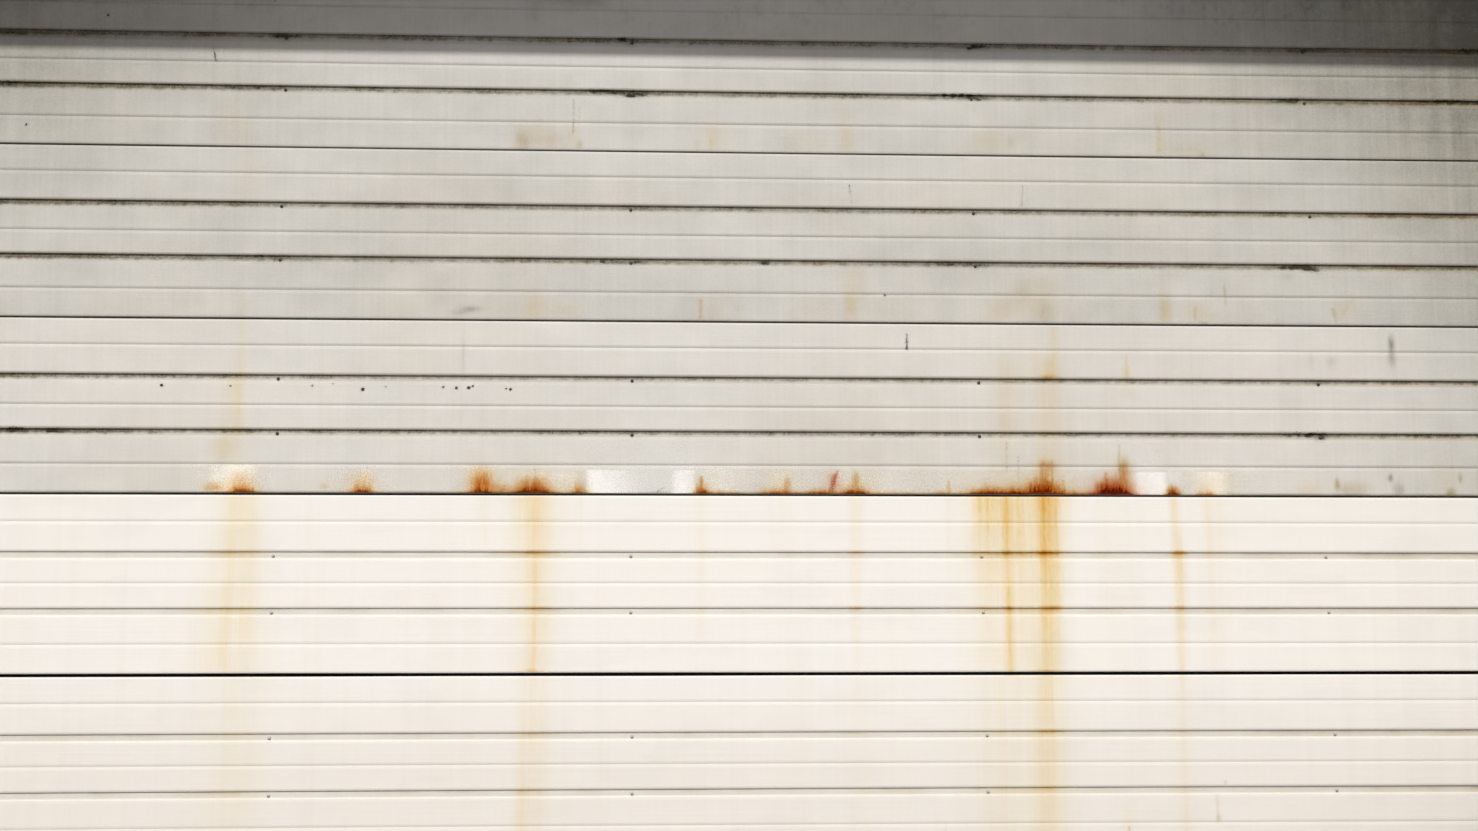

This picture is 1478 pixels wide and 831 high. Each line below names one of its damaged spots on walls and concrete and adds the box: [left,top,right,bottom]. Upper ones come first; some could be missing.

corrosion [970,486,1132,495]